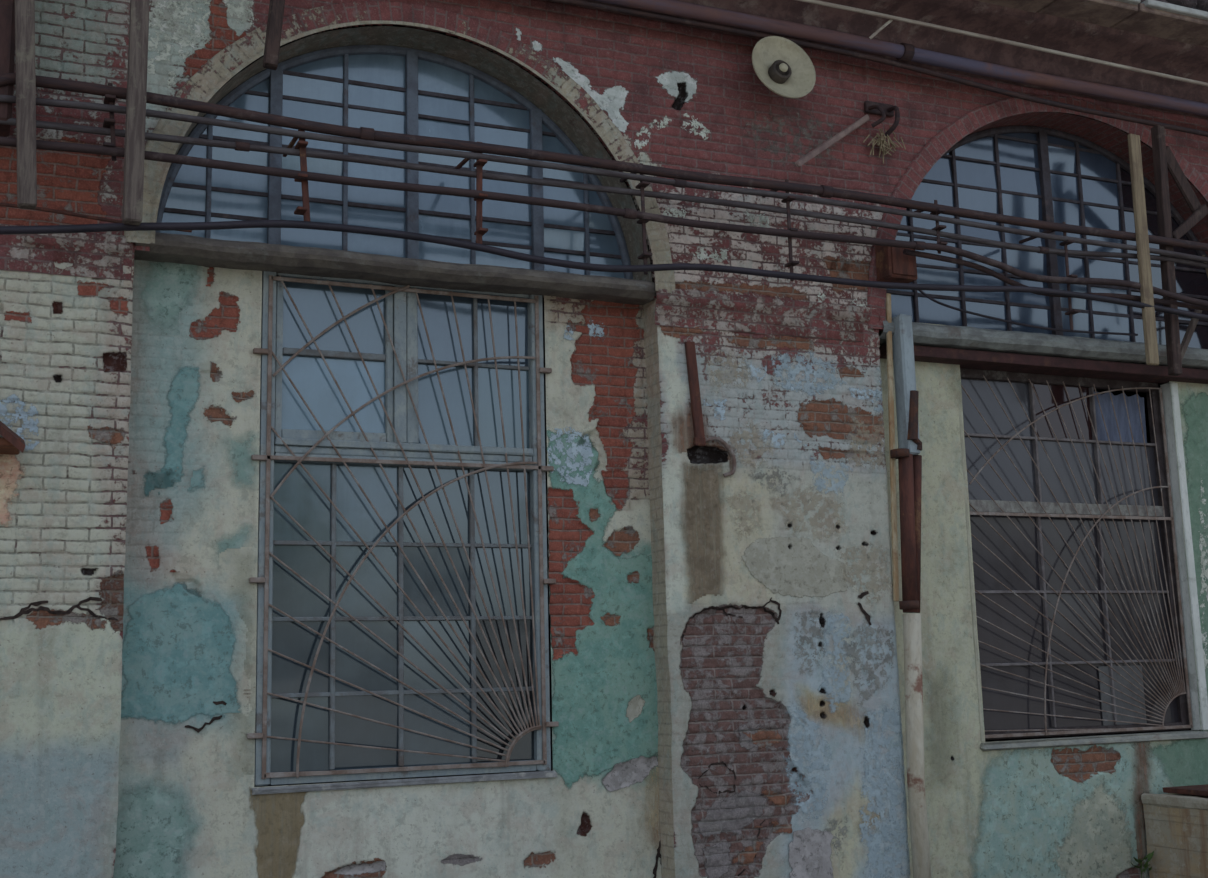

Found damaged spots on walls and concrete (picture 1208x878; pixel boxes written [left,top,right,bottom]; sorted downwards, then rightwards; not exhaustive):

flaking render [166,0,246,92]
spalling [632,82,688,149]
flaking render [189,267,241,340]
flaking render [564,300,644,511]
flaking render [725,335,885,466]
hole [687,446,728,464]
crack [0,597,118,621]
flaking render [547,487,640,660]
water stain [683,464,723,602]
flaking render [679,604,848,878]
flaking render [1051,745,1121,783]
spalling [321,858,387,878]